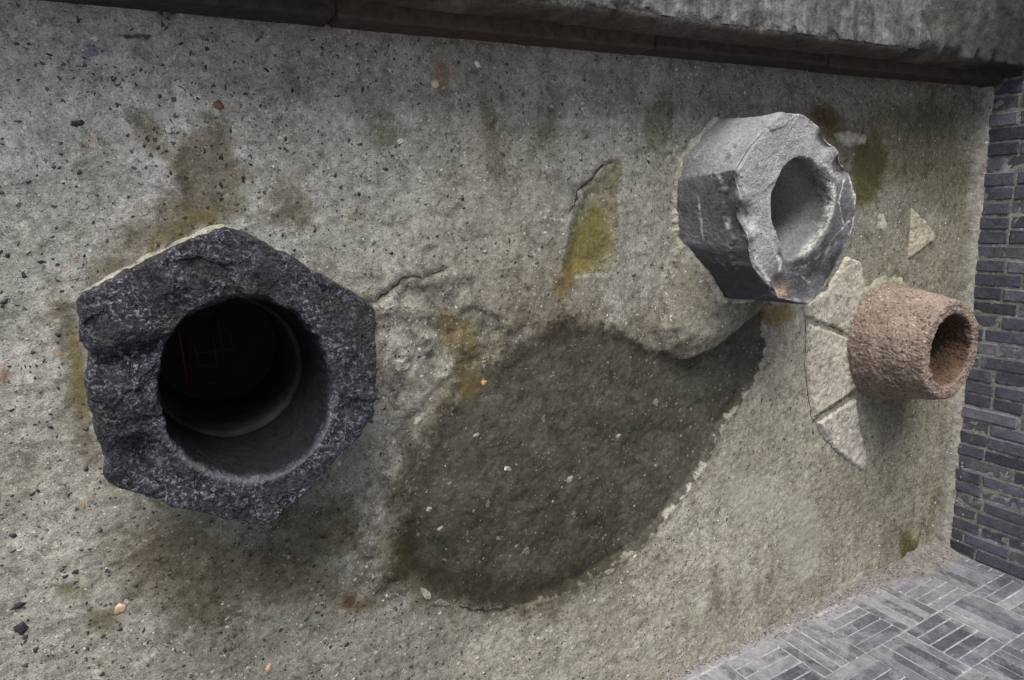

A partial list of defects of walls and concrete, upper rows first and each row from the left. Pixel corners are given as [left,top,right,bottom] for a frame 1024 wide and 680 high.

crack [371,269,445,315]